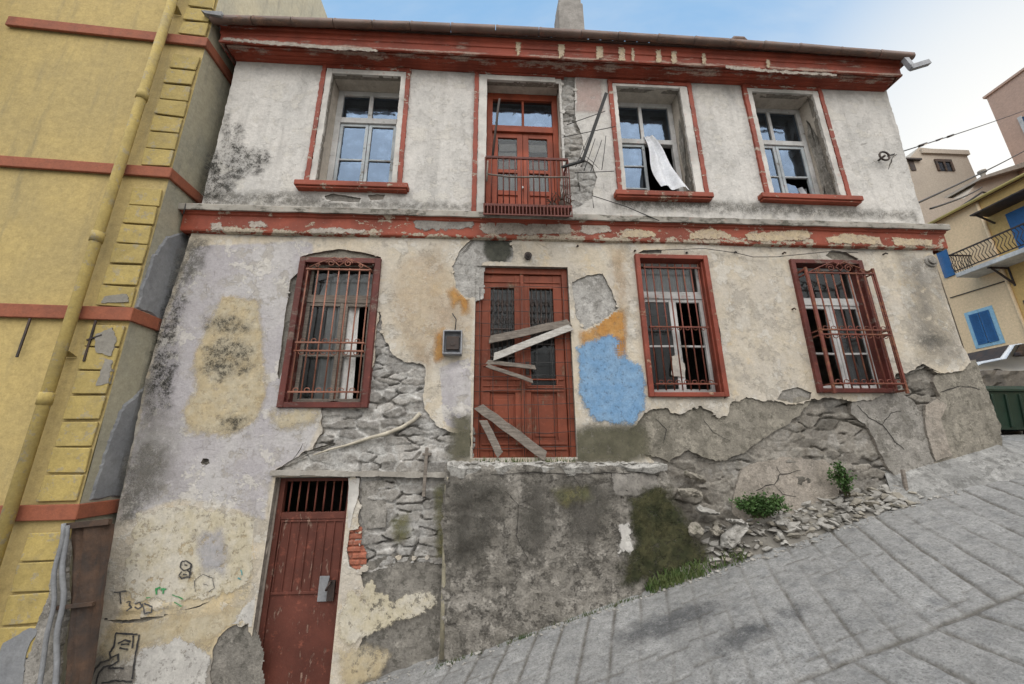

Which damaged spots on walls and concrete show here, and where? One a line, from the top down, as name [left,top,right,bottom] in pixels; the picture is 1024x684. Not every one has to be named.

peeling [223,37,377,52]
water stain [204,117,350,207]
flaking render [413,220,661,301]
peeling [745,230,811,242]
peeling [826,233,932,260]
water stain [206,316,253,381]
crack [896,365,978,393]
crack [857,405,904,449]
flaking render [182,297,475,684]
flaking render [612,387,886,542]
crack [756,468,801,497]
peeling [101,505,265,684]